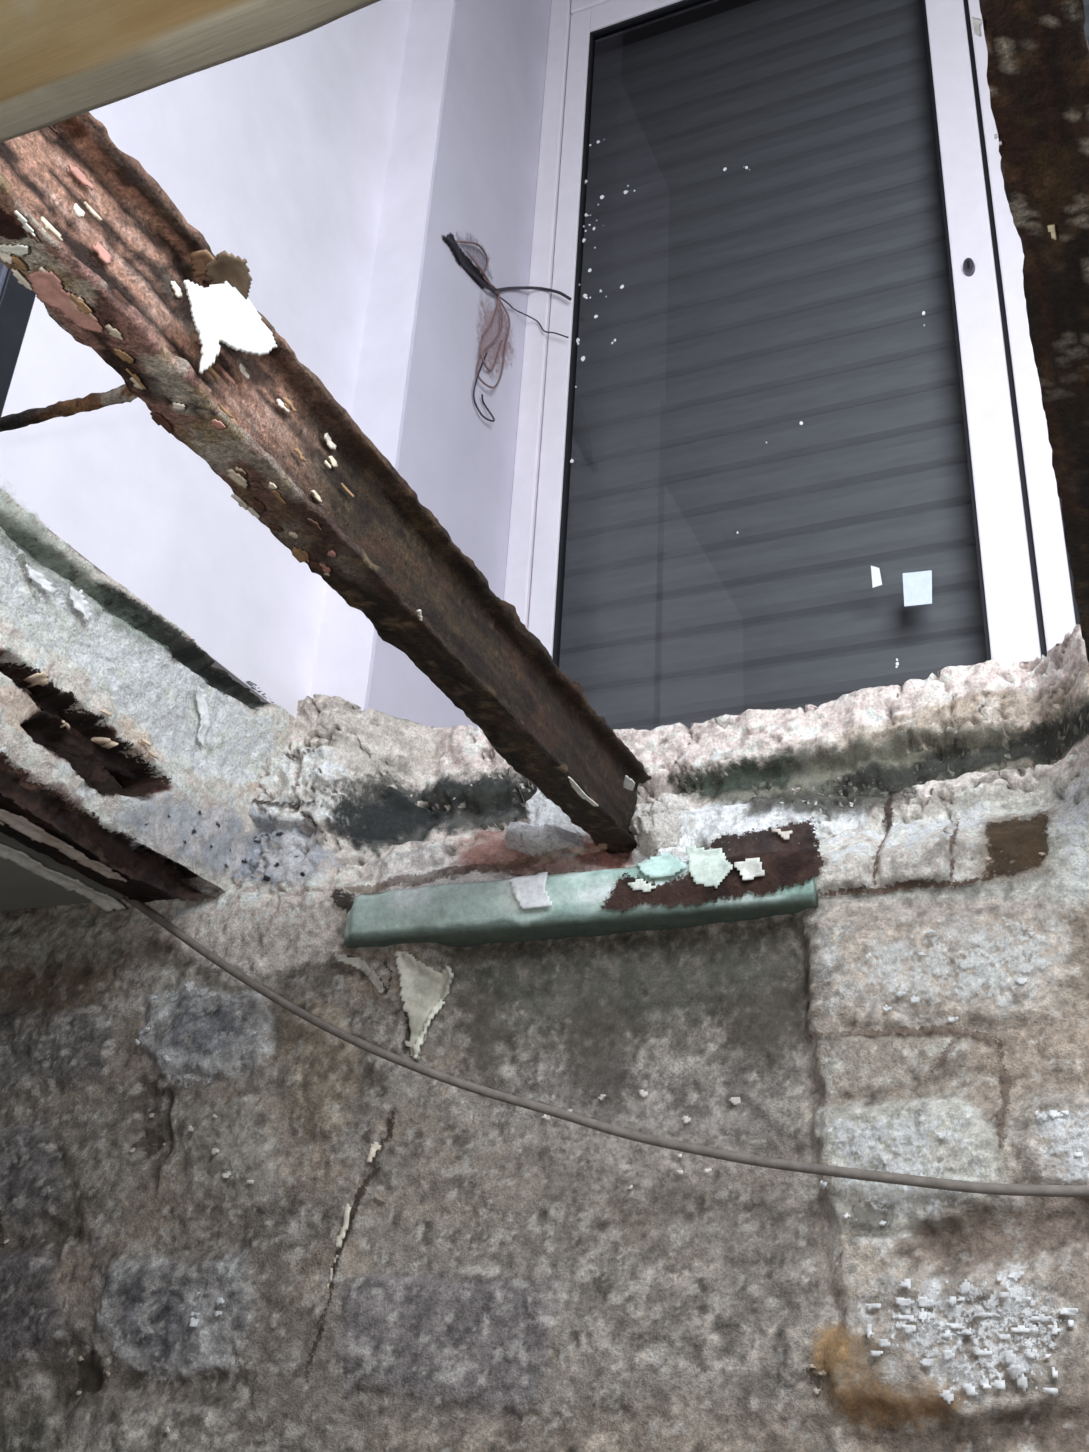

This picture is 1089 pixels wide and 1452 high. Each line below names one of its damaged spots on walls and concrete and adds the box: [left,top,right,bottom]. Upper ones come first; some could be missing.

peeling [0,208,146,390]
flaking render [0,809,127,912]
rust [0,751,213,902]
peeling [0,655,341,885]
leakage [318,769,537,857]
peeling [319,843,607,916]
rust [454,830,631,876]
peeling [600,816,824,914]
leakage [668,696,1089,816]
spalling [982,812,1049,880]
crack [304,1108,397,1378]
rust [815,1322,962,1426]